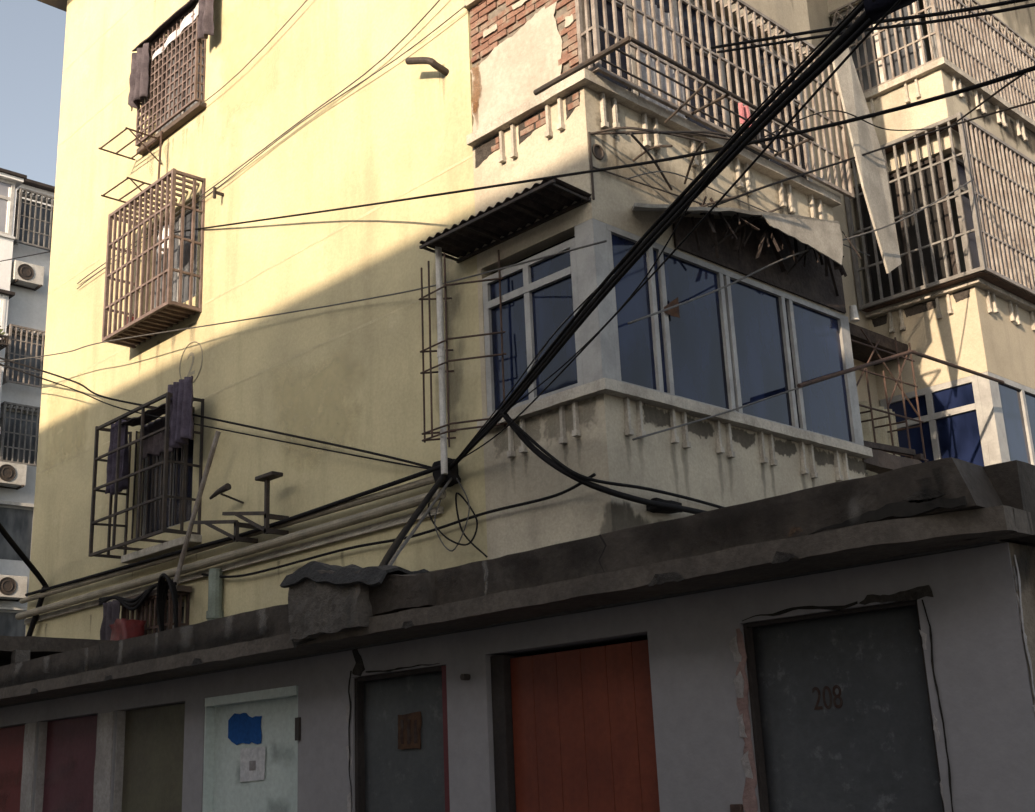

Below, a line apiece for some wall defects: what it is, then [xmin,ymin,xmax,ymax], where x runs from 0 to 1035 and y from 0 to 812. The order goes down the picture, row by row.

flaking render [470,0,580,132]
flaking render [518,109,546,145]
flaking render [475,135,500,168]
leakage [643,404,671,427]
leakage [687,417,714,439]
leakage [731,428,755,449]
leakage [773,438,797,457]
leakage [813,447,834,465]
leakage [826,457,867,497]
spalling [809,468,967,535]
peeling [729,585,954,812]